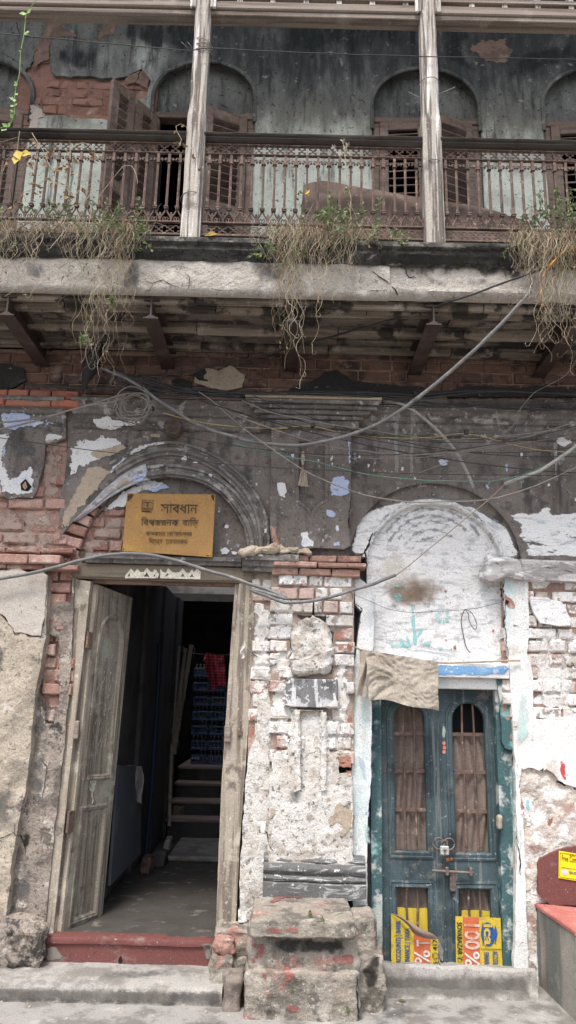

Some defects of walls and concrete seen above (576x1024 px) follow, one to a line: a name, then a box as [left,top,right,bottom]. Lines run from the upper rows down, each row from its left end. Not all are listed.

flaking render [15,23,159,128]
water stain [292,28,398,56]
peeling [470,38,513,63]
flaking render [0,389,82,495]
flaking render [61,416,169,527]
flaking render [326,797,355,836]
flaking render [336,756,352,777]
flaking render [519,768,576,901]